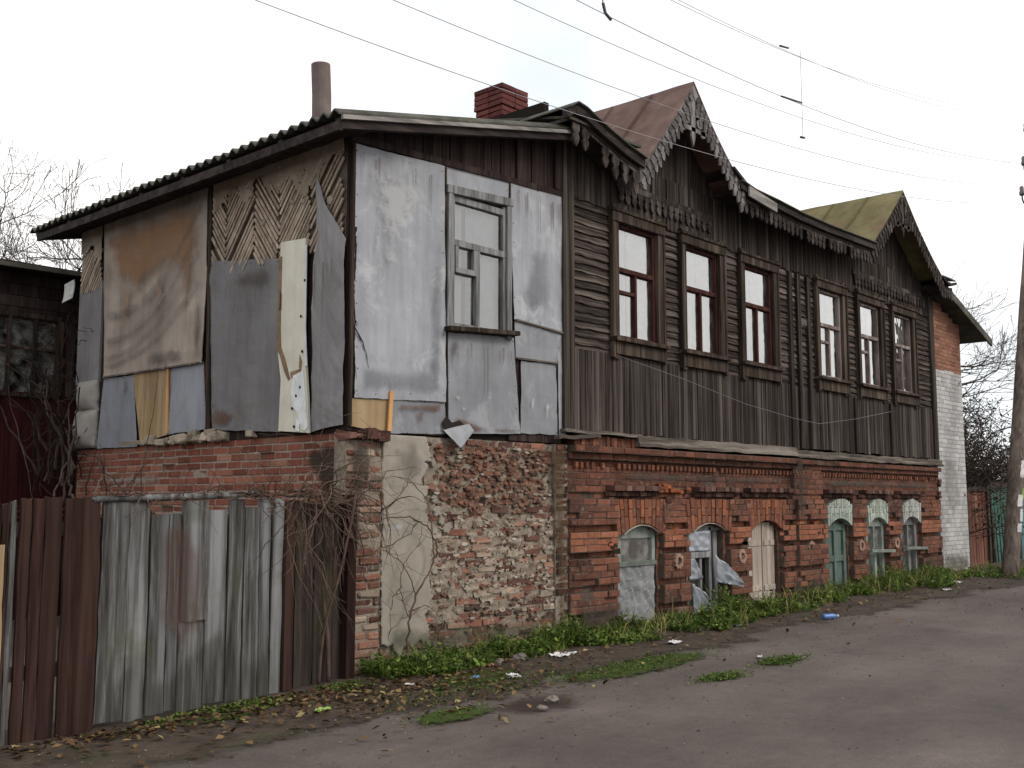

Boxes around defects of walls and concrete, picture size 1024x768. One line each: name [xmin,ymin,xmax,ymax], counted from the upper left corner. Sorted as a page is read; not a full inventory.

water stain [113,213,193,285]
peeling [379,435,555,658]